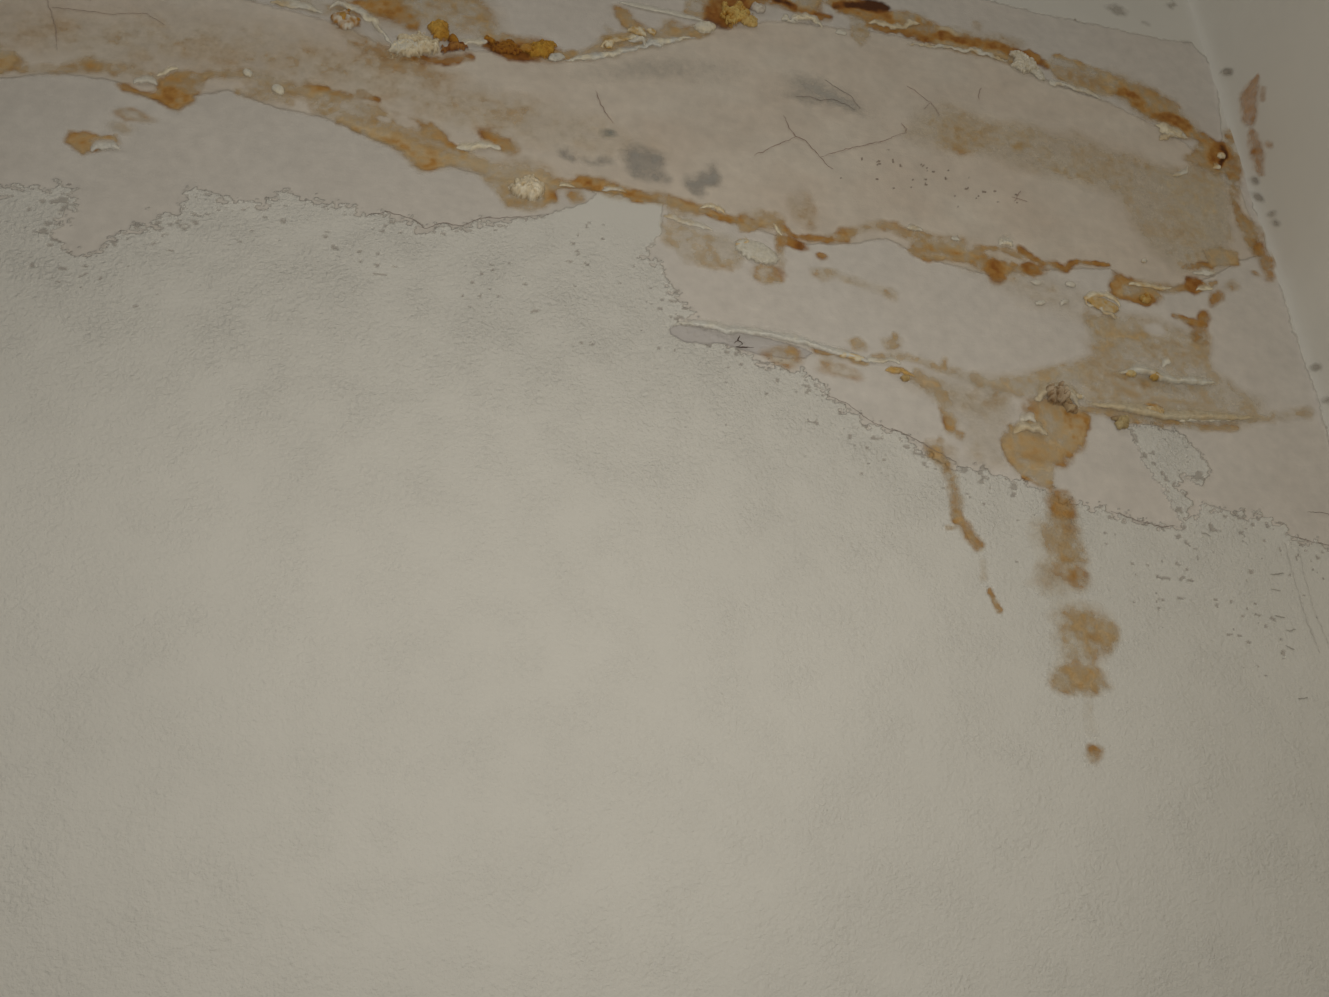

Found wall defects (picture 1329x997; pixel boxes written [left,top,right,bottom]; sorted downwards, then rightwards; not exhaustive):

peeling [0,73,596,257]
peeling [251,0,1231,152]
crack [755,81,939,169]
damp [0,0,1262,588]
peeling [640,162,1329,551]
damp [987,588,1003,612]
damp [1052,610,1118,693]